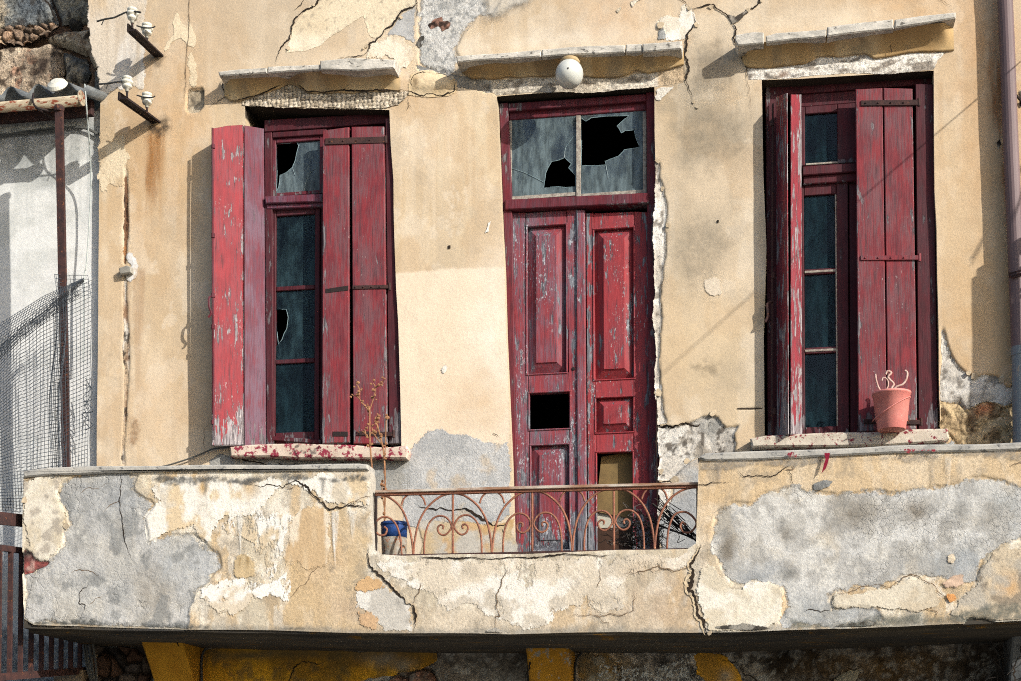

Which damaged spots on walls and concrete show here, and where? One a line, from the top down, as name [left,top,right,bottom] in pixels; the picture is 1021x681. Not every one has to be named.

crack [276,0,319,59]
crack [337,0,418,59]
peeling [286,0,495,93]
crack [682,0,763,108]
flaking render [652,158,738,516]
flaking render [939,330,1012,410]
peeling [21,476,69,574]
peeling [144,472,370,615]
crack [232,458,372,512]
crack [367,548,421,633]
crack [423,545,712,635]
peeling [376,519,783,632]